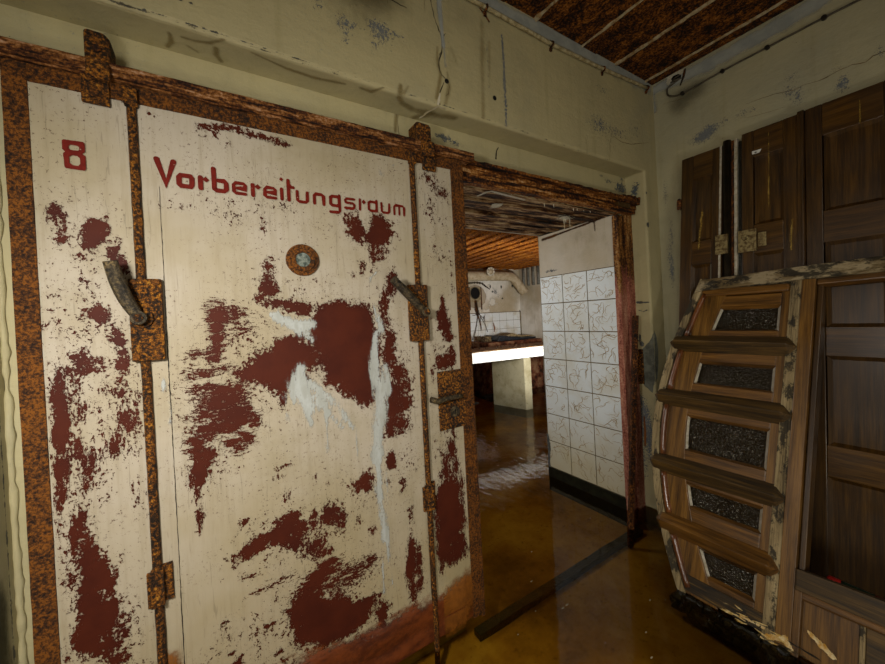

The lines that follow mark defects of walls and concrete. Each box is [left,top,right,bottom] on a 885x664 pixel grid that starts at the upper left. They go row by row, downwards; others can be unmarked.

peeling [196,122,293,148]
peeling [199,191,304,240]
peeling [415,171,457,384]
peeling [40,192,153,664]
peeling [165,209,425,664]
peeling [432,408,470,581]
rust [299,573,473,664]